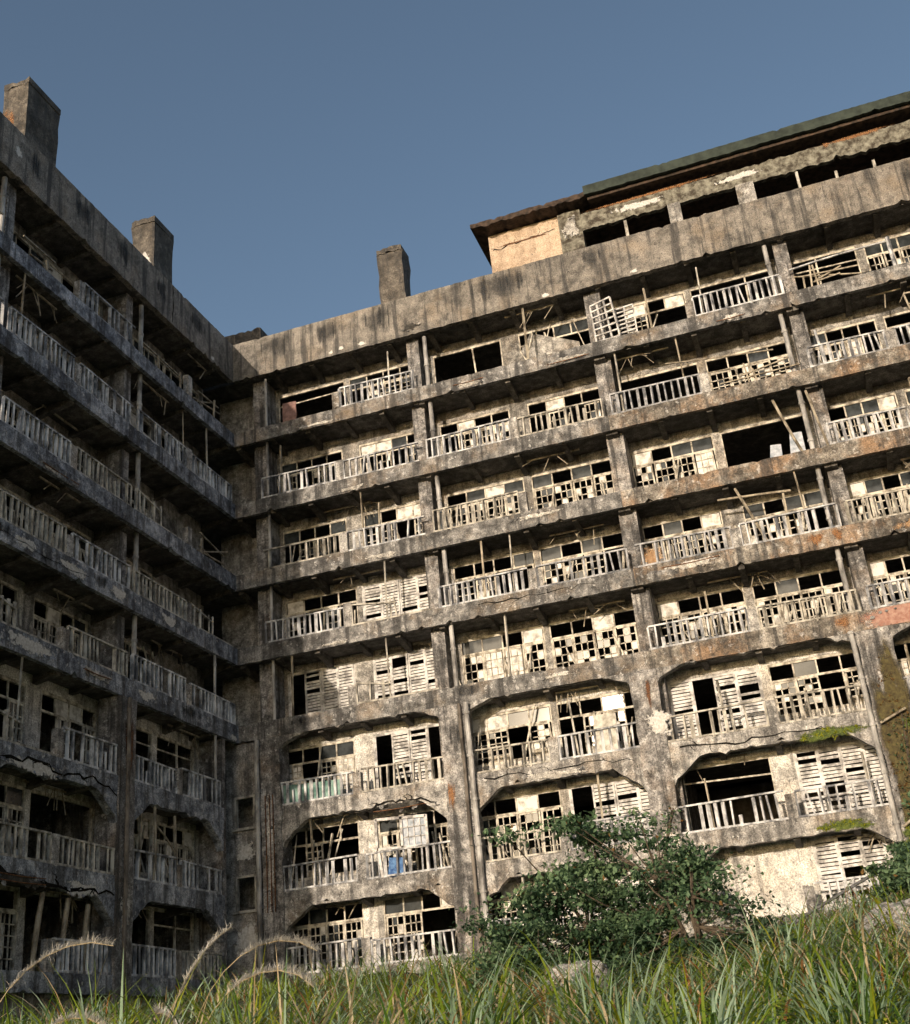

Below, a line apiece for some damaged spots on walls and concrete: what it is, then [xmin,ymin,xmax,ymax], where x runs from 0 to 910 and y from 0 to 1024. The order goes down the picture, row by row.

leakage [471,275,522,301]
leakage [365,310,389,329]
leakage [261,339,285,356]
leakage [318,325,343,354]
crack [0,754,117,796]
spalling [0,870,46,890]
peeling [62,880,99,898]